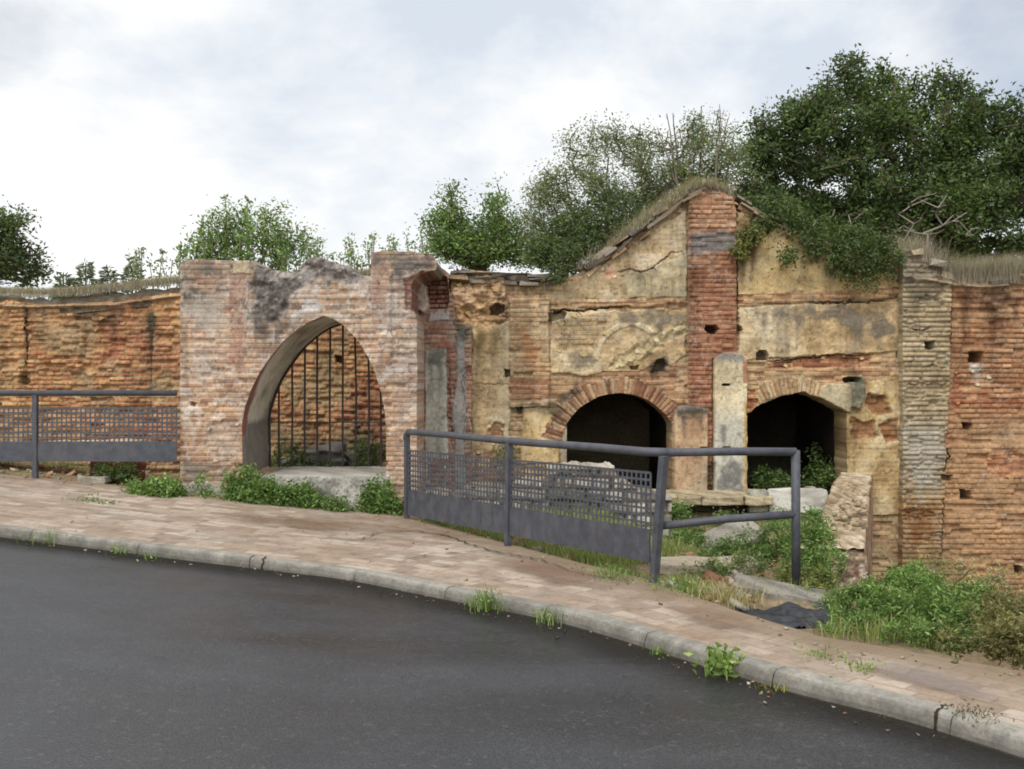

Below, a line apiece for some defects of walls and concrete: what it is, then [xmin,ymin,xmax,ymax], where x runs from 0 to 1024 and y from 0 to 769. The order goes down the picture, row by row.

crack [618,252,679,285]
damp [290,298,321,323]
spalling [402,271,507,328]
crack [23,310,37,372]
spalling [849,392,899,444]
crack [933,704,952,731]